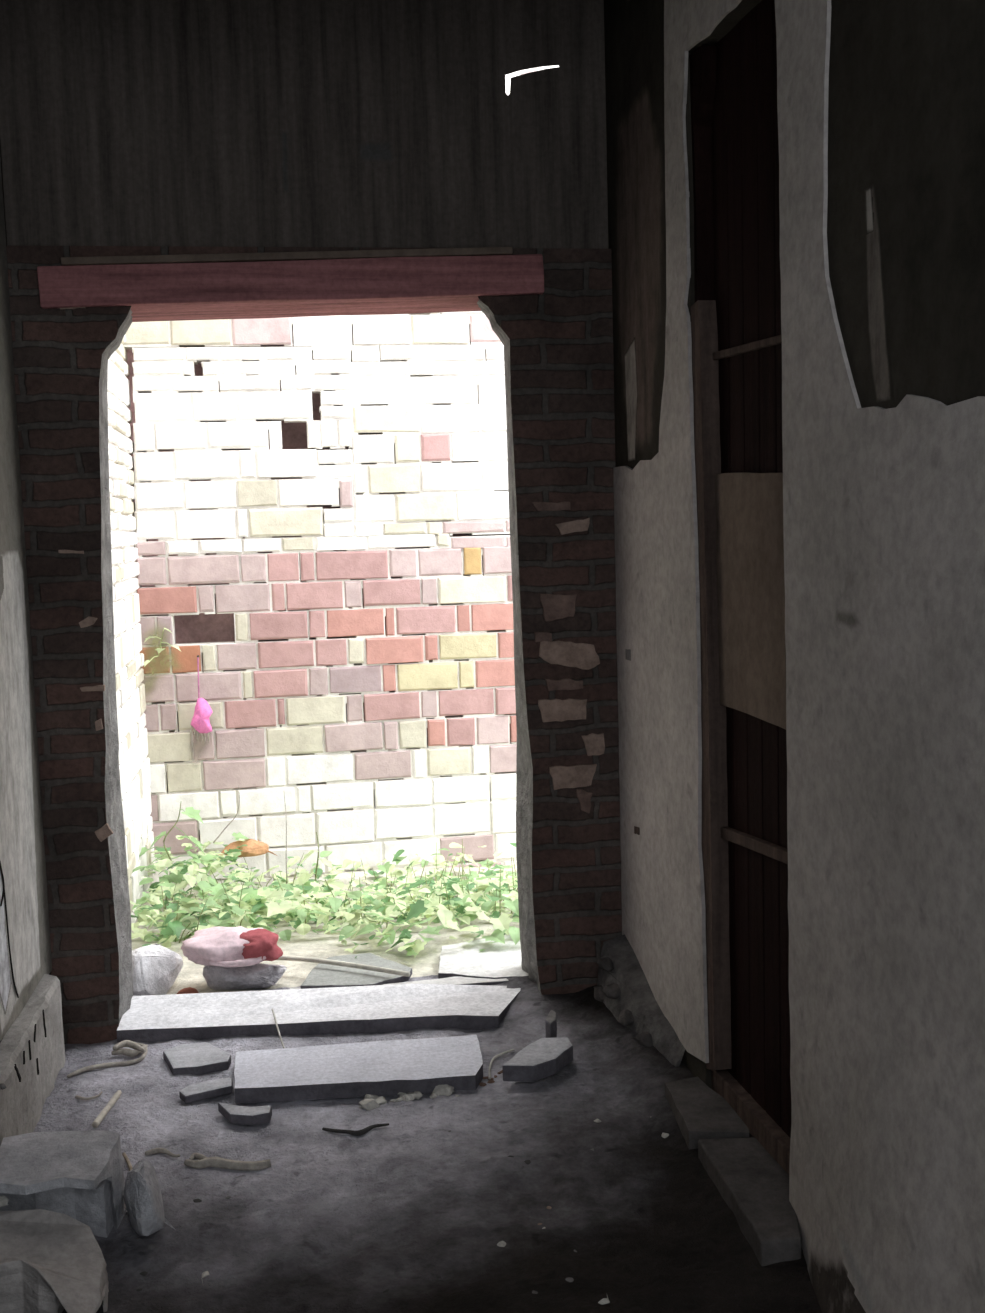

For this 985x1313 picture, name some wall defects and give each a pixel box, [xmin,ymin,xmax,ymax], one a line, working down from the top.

spalling [532,501,590,535]
spalling [534,594,605,813]